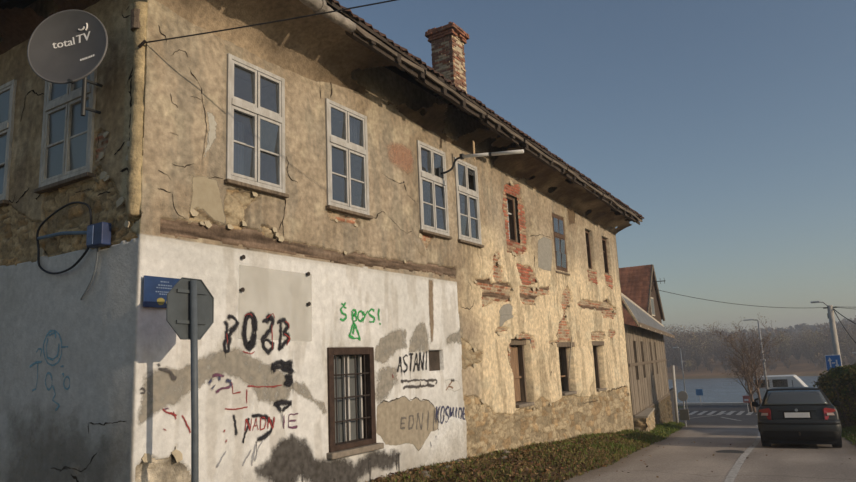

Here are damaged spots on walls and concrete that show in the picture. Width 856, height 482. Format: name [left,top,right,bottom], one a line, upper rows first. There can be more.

crack [158,26,209,219]
flaking render [0,130,141,266]
peeling [189,176,259,230]
flaking render [261,226,284,242]
flaking render [474,180,549,307]
flaking render [549,270,617,346]
crack [50,453,97,482]
flaking render [135,446,191,482]